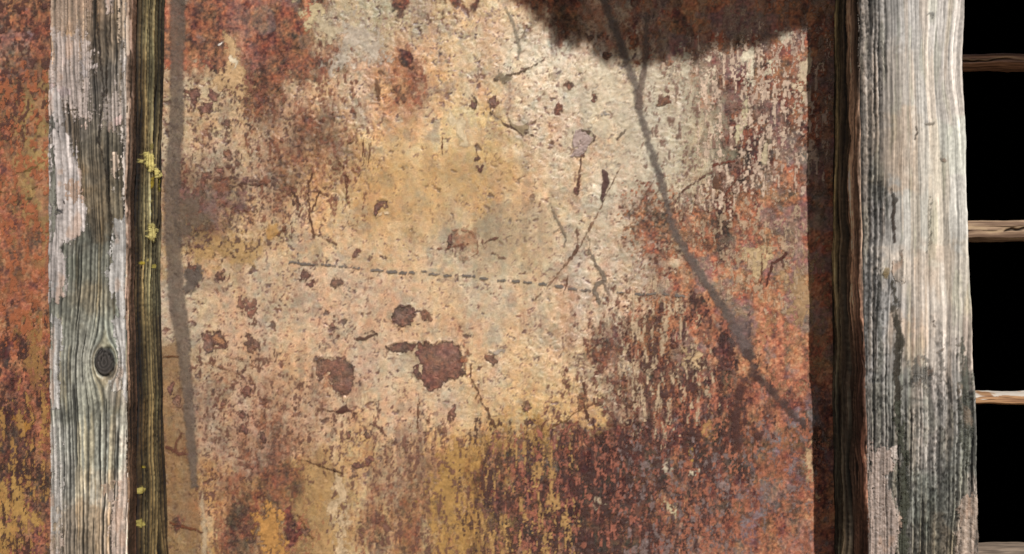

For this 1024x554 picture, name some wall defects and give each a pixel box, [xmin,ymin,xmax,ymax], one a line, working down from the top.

corrosion [0,0,51,554]
corrosion [164,0,835,554]
peeling [571,129,596,157]